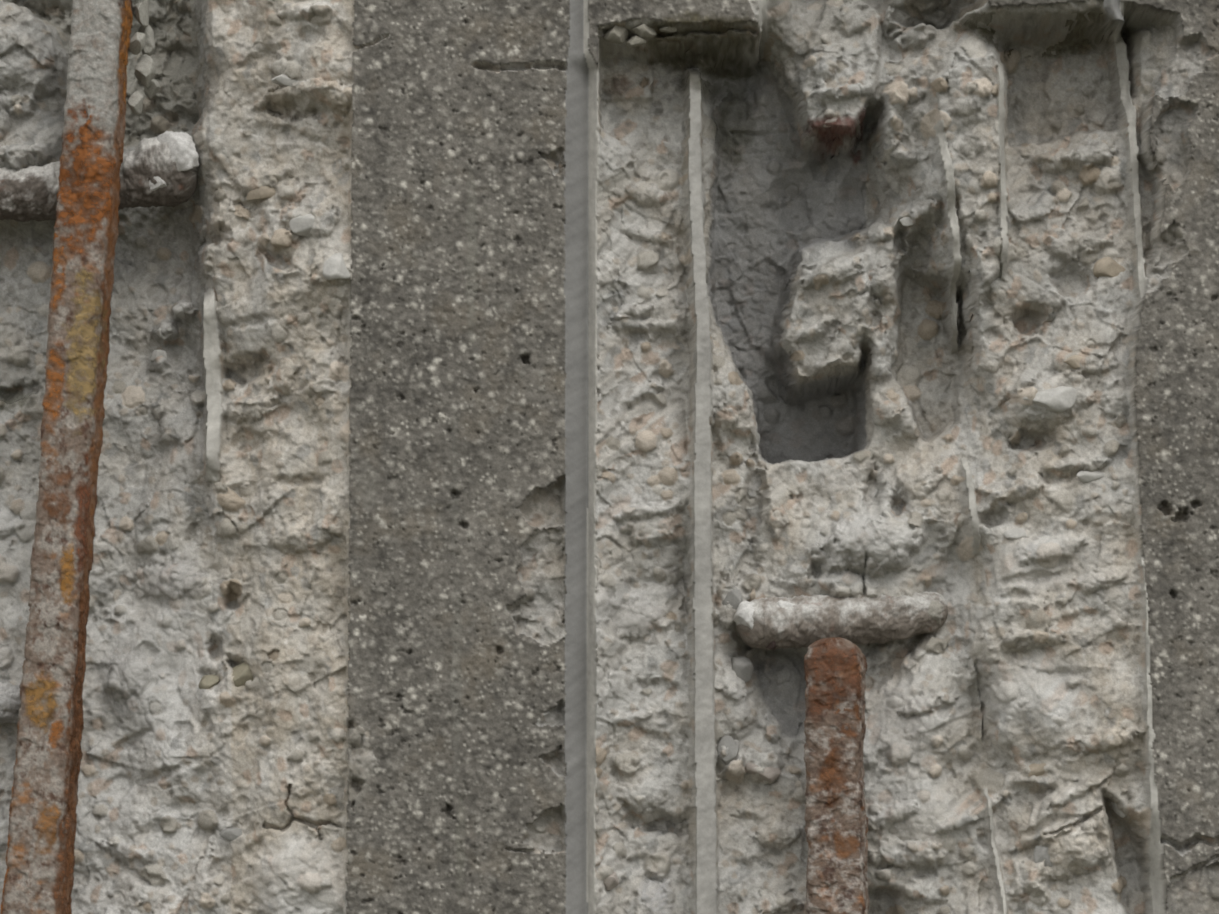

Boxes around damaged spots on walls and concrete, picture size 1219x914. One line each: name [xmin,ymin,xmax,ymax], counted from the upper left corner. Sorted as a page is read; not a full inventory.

spalling [0,0,73,170]
rust [118,0,133,107]
rust [42,106,121,447]
spalling [0,219,56,685]
spalling [71,0,378,914]
spalling [595,0,1219,914]
spalling [507,476,567,647]
spalling [0,723,18,912]
rust [17,453,97,914]
spalling [522,806,567,853]
spalling [540,746,567,777]
rust [804,637,867,807]